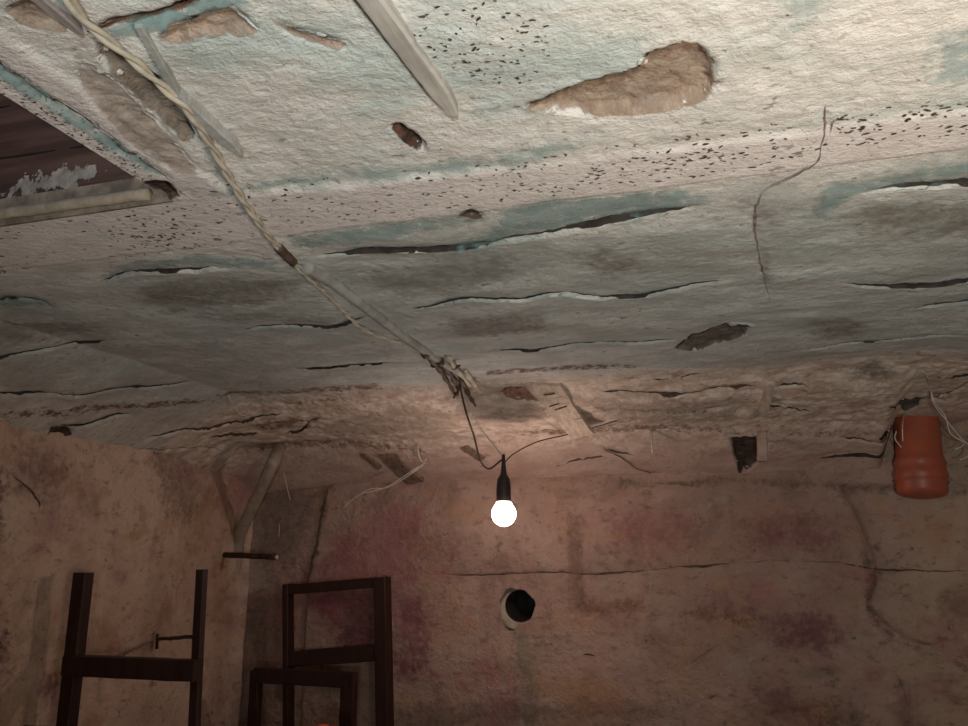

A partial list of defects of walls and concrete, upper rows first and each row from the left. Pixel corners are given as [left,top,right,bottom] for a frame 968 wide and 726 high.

crack [86,0,199,32]
spalling [113,0,257,43]
spalling [528,41,718,117]
spalling [0,39,199,200]
spalling [392,122,422,149]
crack [753,106,836,302]
crack [305,204,708,259]
crack [400,279,734,313]
crack [840,278,968,308]
spalling [676,323,747,351]
crack [146,413,318,451]
spalling [731,436,758,473]